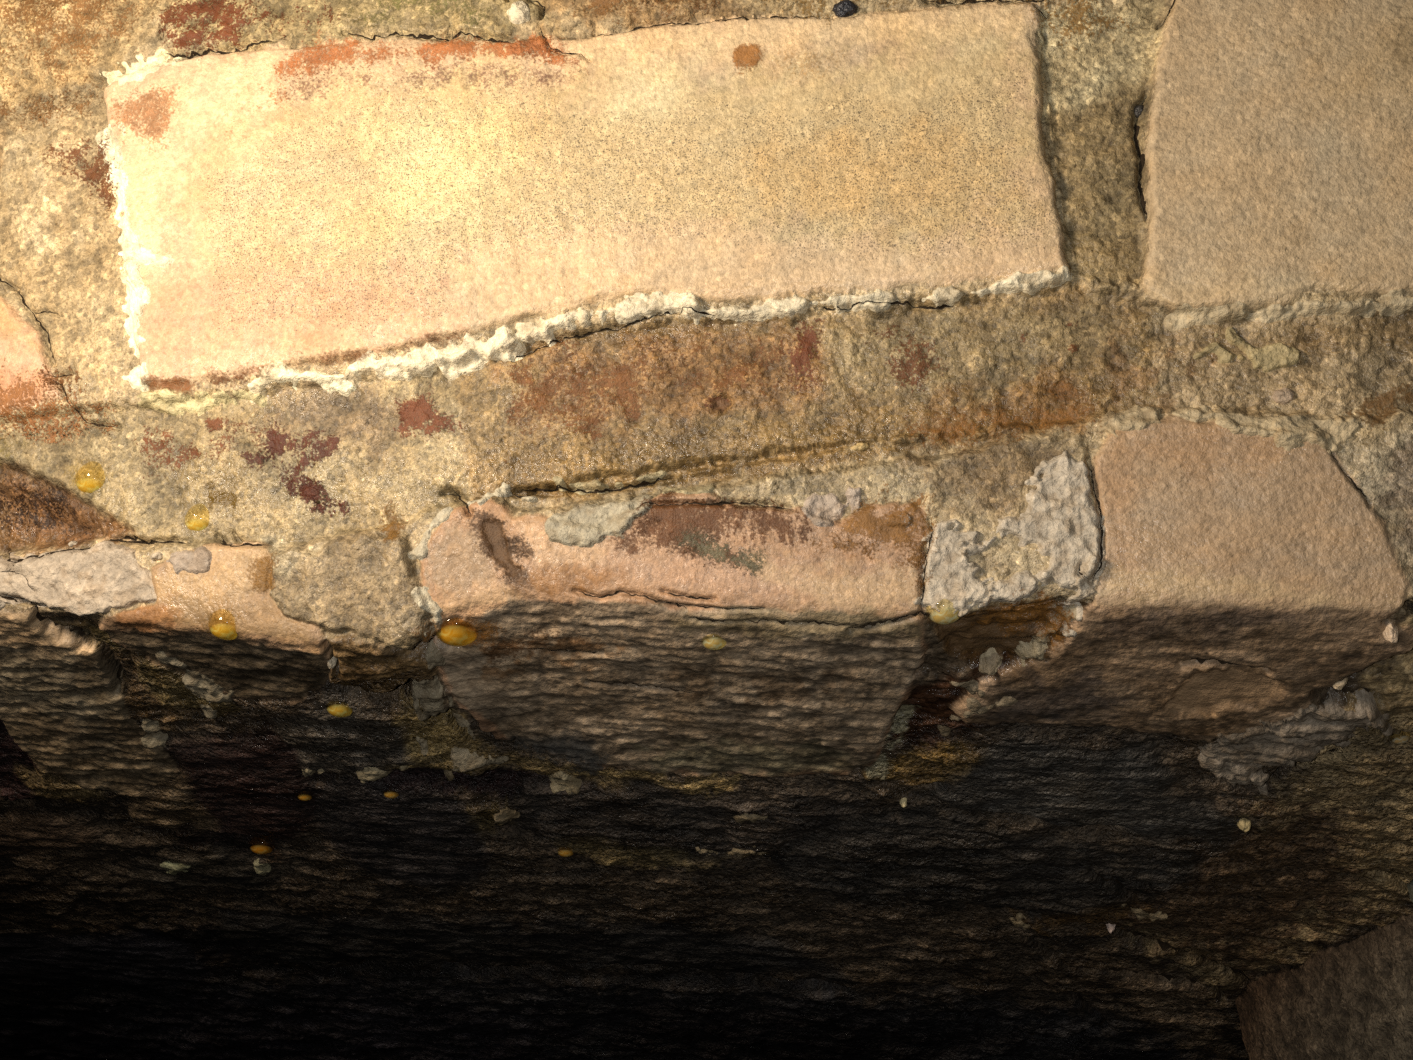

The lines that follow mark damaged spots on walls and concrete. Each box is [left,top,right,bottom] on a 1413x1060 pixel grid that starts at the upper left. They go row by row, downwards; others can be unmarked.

damp [99,49,182,91]
corrosion [0,0,578,230]
damp [95,122,899,416]
damp [916,265,1072,307]
damp [205,482,237,509]
damp [408,482,538,560]
damp [801,486,861,527]
damp [913,450,1107,737]
damp [155,651,234,719]
damp [411,586,591,781]
damp [355,765,409,784]
damp [547,770,582,795]